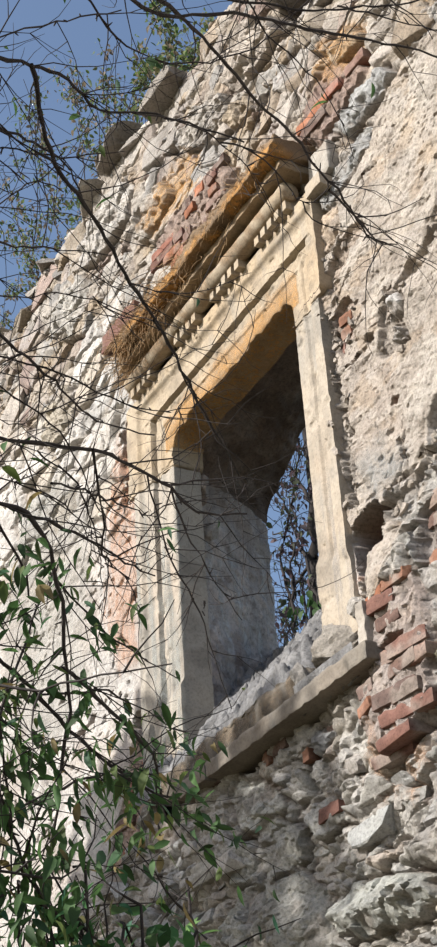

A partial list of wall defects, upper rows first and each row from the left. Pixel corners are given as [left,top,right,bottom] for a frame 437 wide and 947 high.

flaking render [296,47,372,149]
flaking render [356,430,437,773]